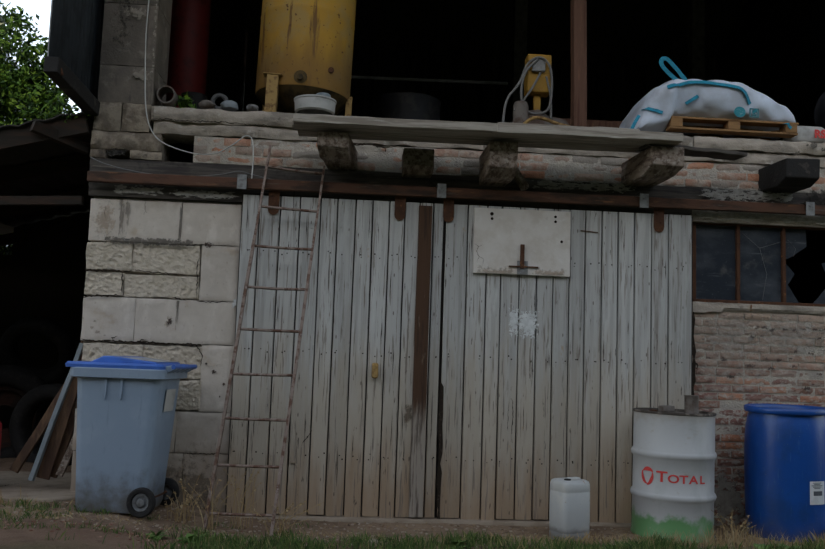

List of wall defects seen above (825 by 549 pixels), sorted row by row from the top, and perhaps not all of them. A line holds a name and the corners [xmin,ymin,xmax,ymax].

peeling [508,306,539,340]
peeling [714,471,745,526]